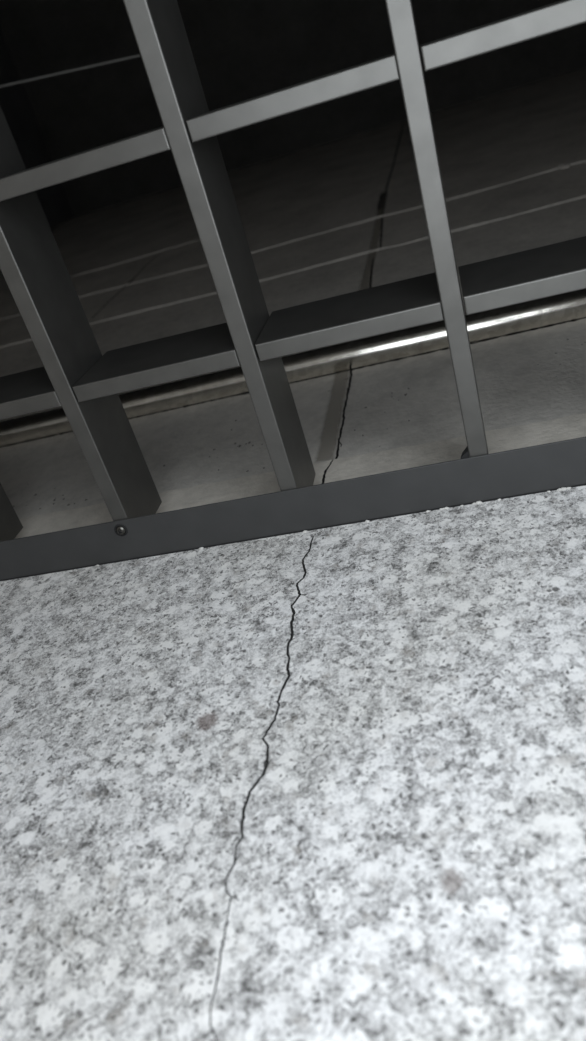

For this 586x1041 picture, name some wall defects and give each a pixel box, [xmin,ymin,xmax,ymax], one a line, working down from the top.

crack [369,123,404,288]
crack [209,536,314,1041]